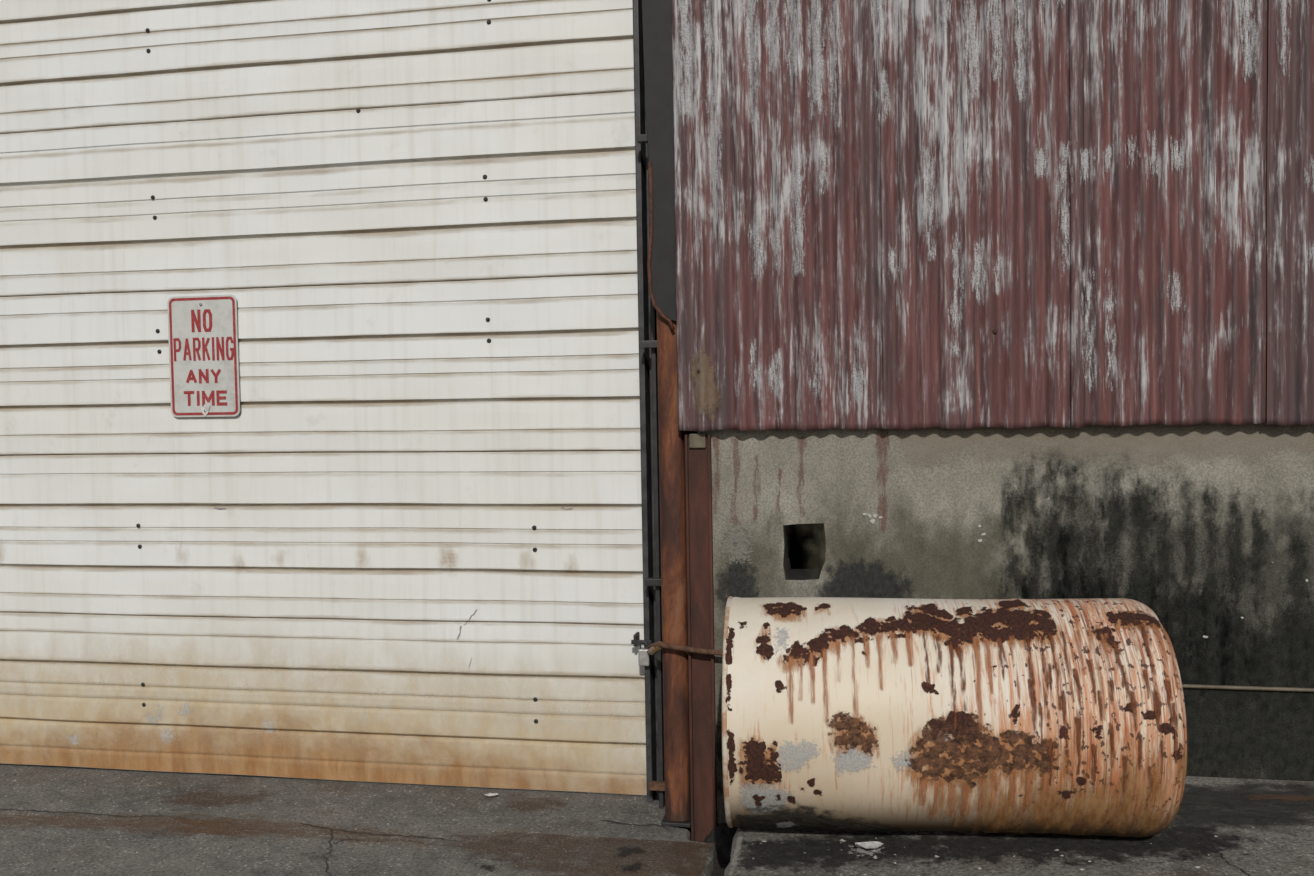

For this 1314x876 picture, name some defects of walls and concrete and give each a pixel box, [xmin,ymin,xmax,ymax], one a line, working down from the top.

rust [692,350,720,421]
rust [646,641,723,656]
damp [732,425,1314,872]
rust [0,665,642,795]
crack [3,809,150,817]
crack [301,822,465,876]